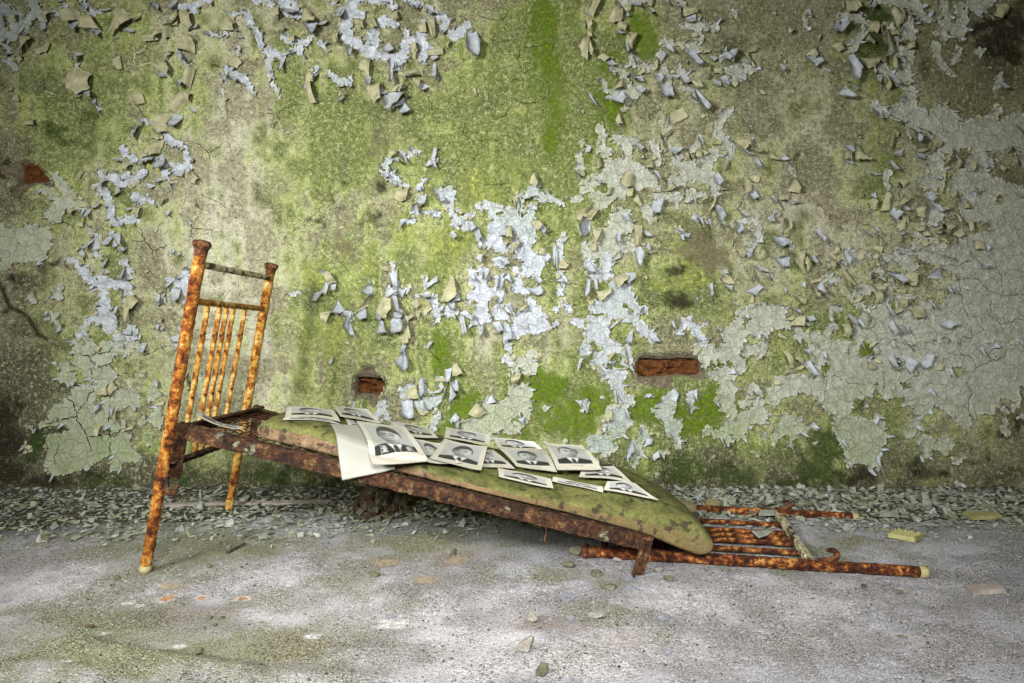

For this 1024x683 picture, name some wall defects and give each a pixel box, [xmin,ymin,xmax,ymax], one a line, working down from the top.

leakage [972,0,1024,65]
leakage [0,273,48,340]
peeling [0,0,572,558]
peeling [284,0,1024,545]
leakage [666,292,693,308]
leakage [669,232,732,274]
crack [49,347,113,465]
leakage [0,393,71,487]
leakage [847,467,874,485]